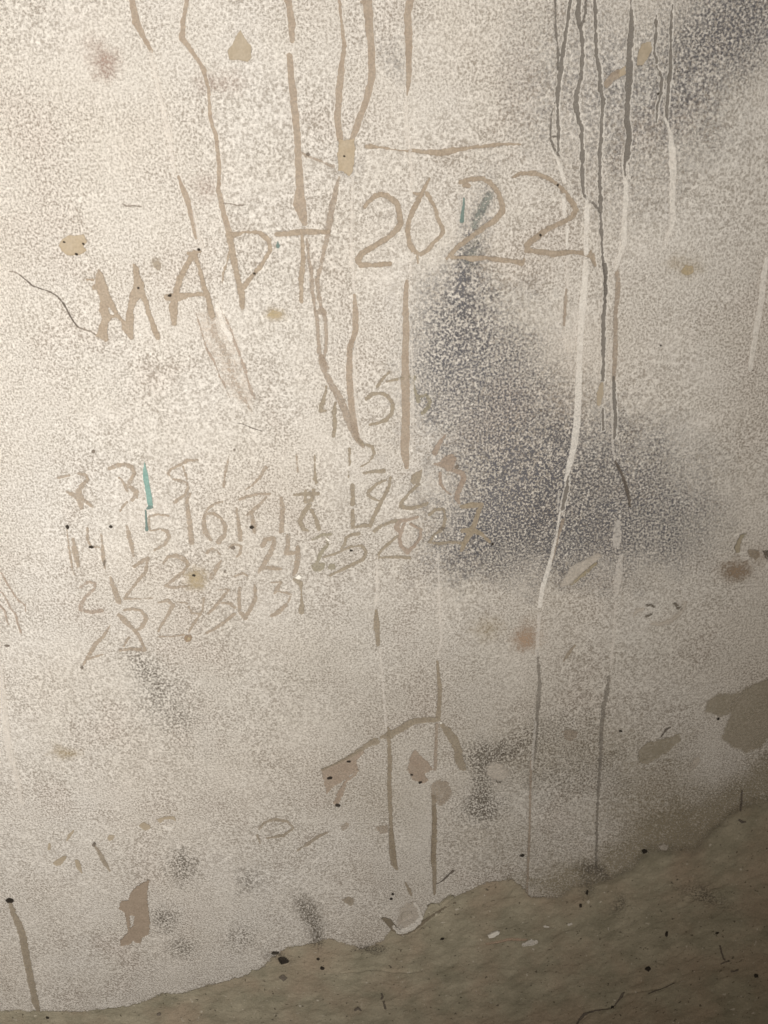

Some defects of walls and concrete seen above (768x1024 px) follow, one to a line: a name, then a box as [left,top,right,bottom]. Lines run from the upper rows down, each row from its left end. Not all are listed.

peeling [228,30,251,62]
peeling [59,234,87,256]
crack [9,271,97,335]
leakage [398,0,705,892]
flaking render [0,679,768,1024]